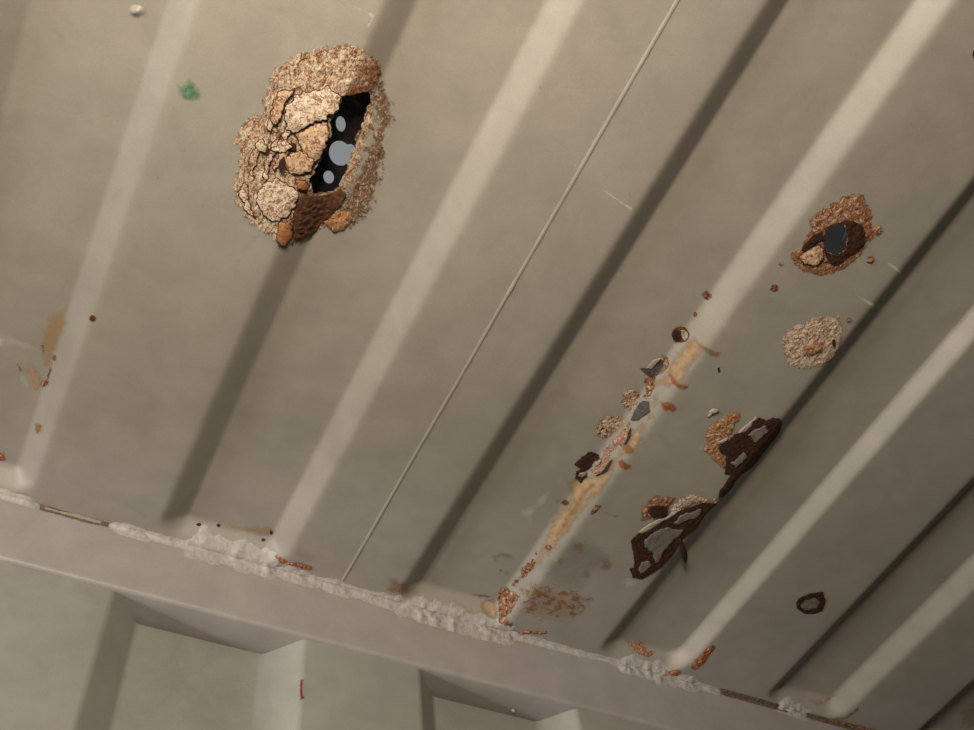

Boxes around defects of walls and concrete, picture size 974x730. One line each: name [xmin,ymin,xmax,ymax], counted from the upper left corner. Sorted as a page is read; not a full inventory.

peeling [238,85,342,247]
peeling [798,245,824,266]
peeling [575,355,669,483]
peeling [717,416,757,444]
rust [629,412,782,579]
rust [479,389,650,635]
peeling [638,494,711,534]
rust [276,554,312,570]
peeling [796,591,826,614]
rust [667,645,715,676]
rust [720,688,792,714]
rust [806,709,875,730]